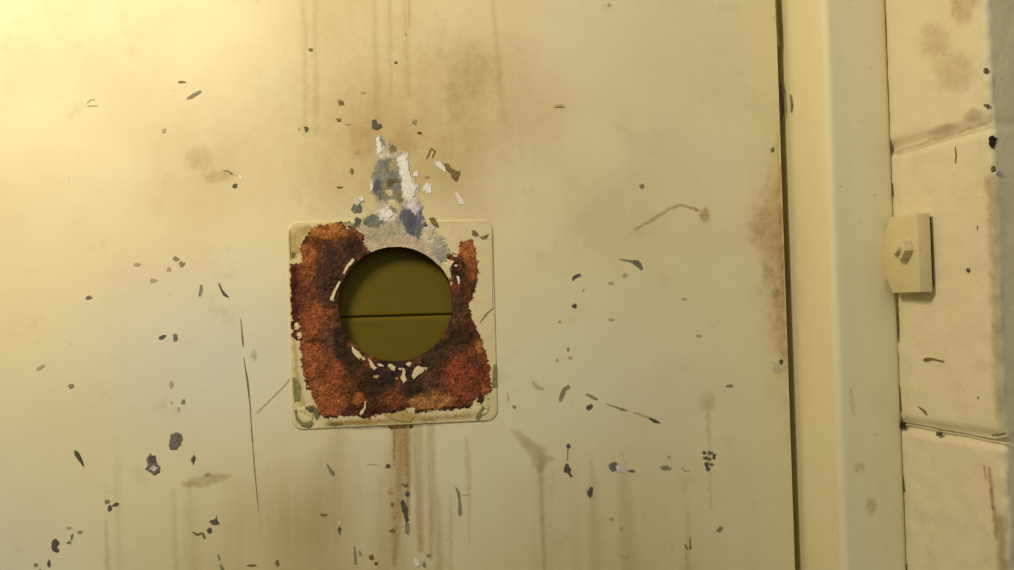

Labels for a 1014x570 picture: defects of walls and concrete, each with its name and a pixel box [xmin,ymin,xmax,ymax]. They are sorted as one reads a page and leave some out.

peeling [343,119,465,286]
corrosion [289,221,493,419]
peeling [169,432,183,450]
peeling [145,453,161,476]
peeling [609,462,635,473]
peeling [702,451,716,471]
peeling [585,483,595,500]
peeling [192,515,220,539]
peeling [34,526,82,570]